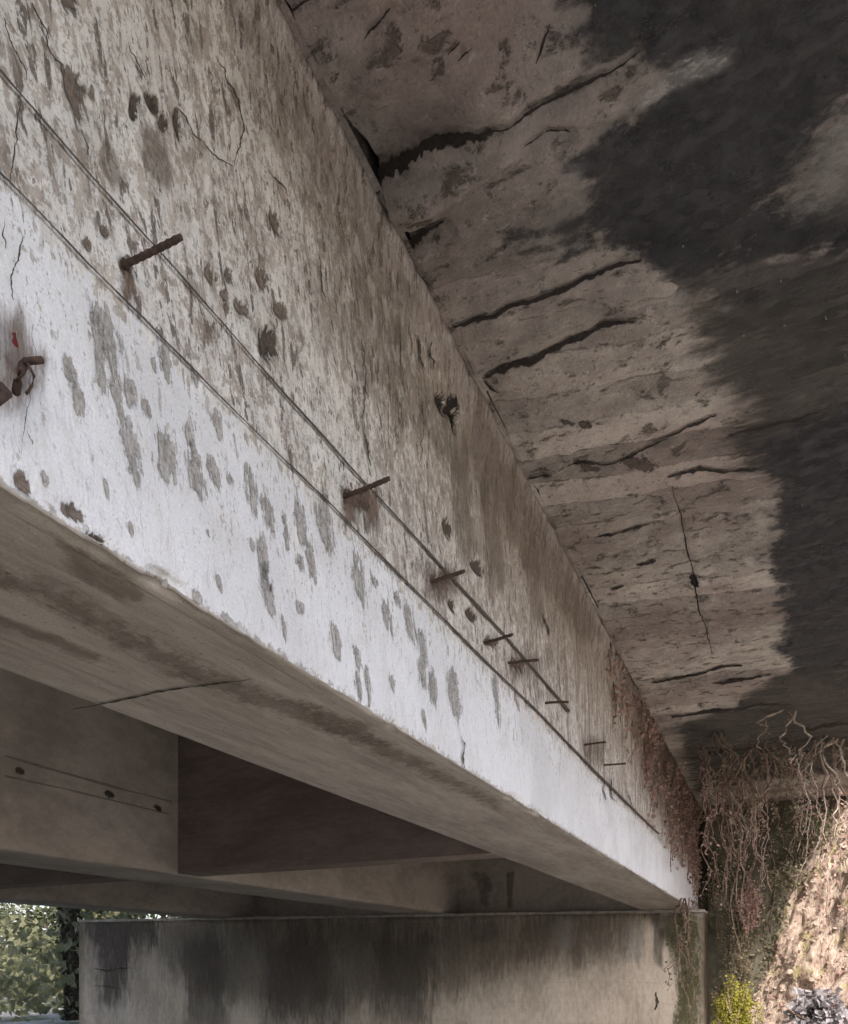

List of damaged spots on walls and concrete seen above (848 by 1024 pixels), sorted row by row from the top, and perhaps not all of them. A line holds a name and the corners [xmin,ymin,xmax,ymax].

crack [177,58,245,167]
crack [376,52,639,195]
rust [120,263,136,300]
crack [452,259,642,328]
rust [0,310,47,403]
spalling [434,394,459,434]
crack [482,321,634,393]
crack [528,410,821,479]
water stain [505,0,848,792]
crack [594,466,791,718]
water stain [85,921,155,1005]
water stain [652,913,703,1024]